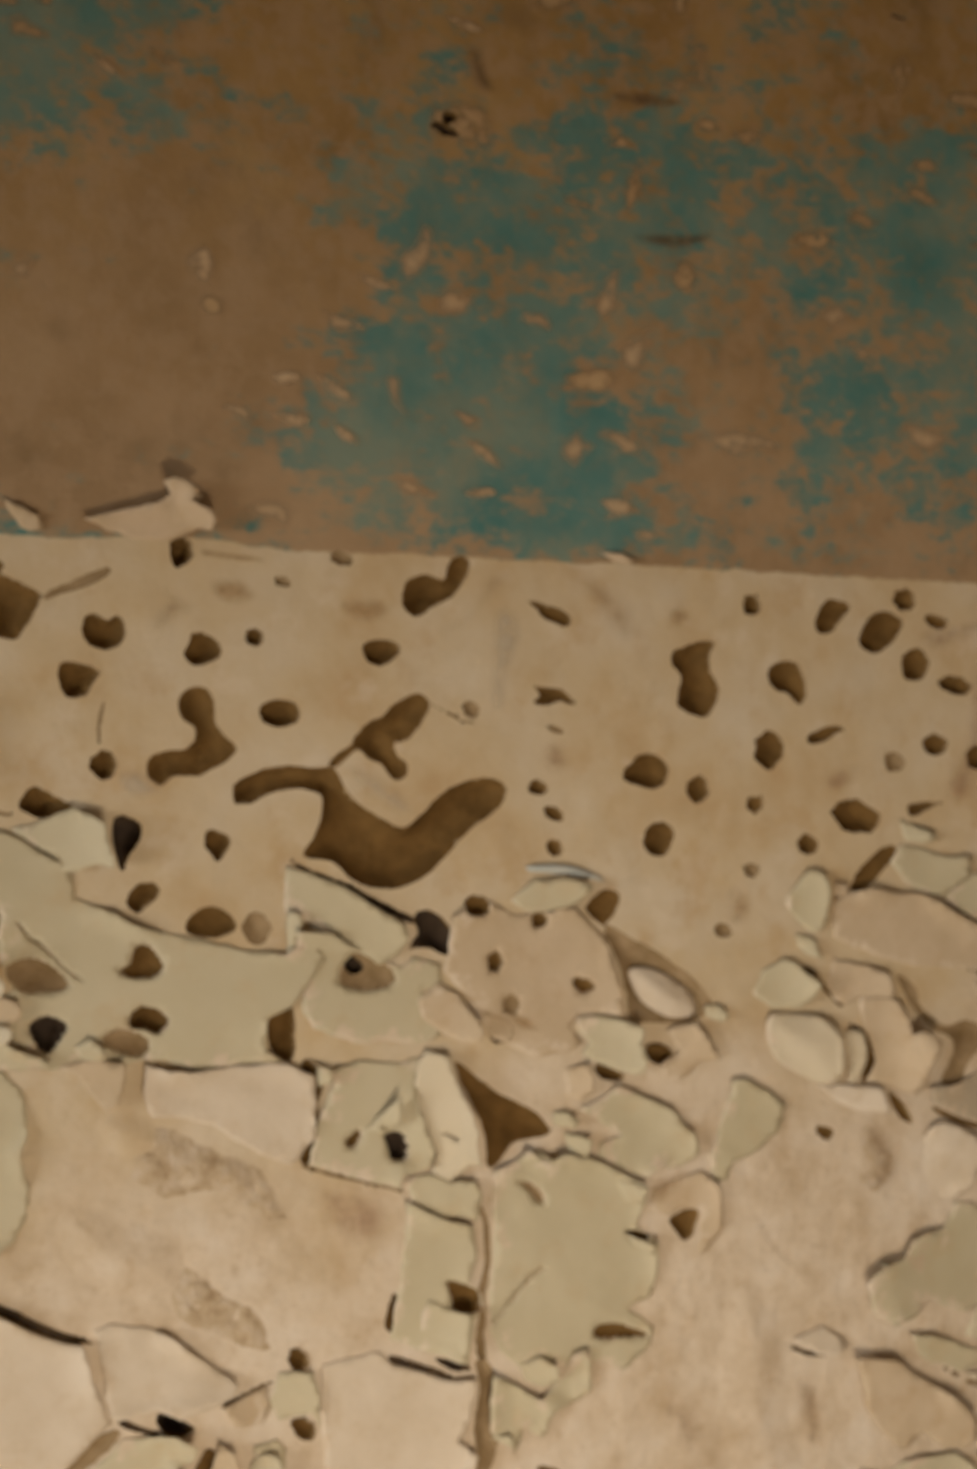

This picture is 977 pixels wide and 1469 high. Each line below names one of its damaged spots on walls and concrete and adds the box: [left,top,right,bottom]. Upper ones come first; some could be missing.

spalling [0,561,111,640]
spalling [402,555,470,617]
spalling [671,640,719,718]
spalling [859,588,973,696]
crack [290,859,416,924]
peeling [753,833,977,1125]
peeling [0,686,786,1469]
crack [933,1106,977,1128]
crack [0,1306,93,1345]
crack [388,1206,545,1469]
crack [222,1381,272,1408]
crack [68,1420,167,1469]